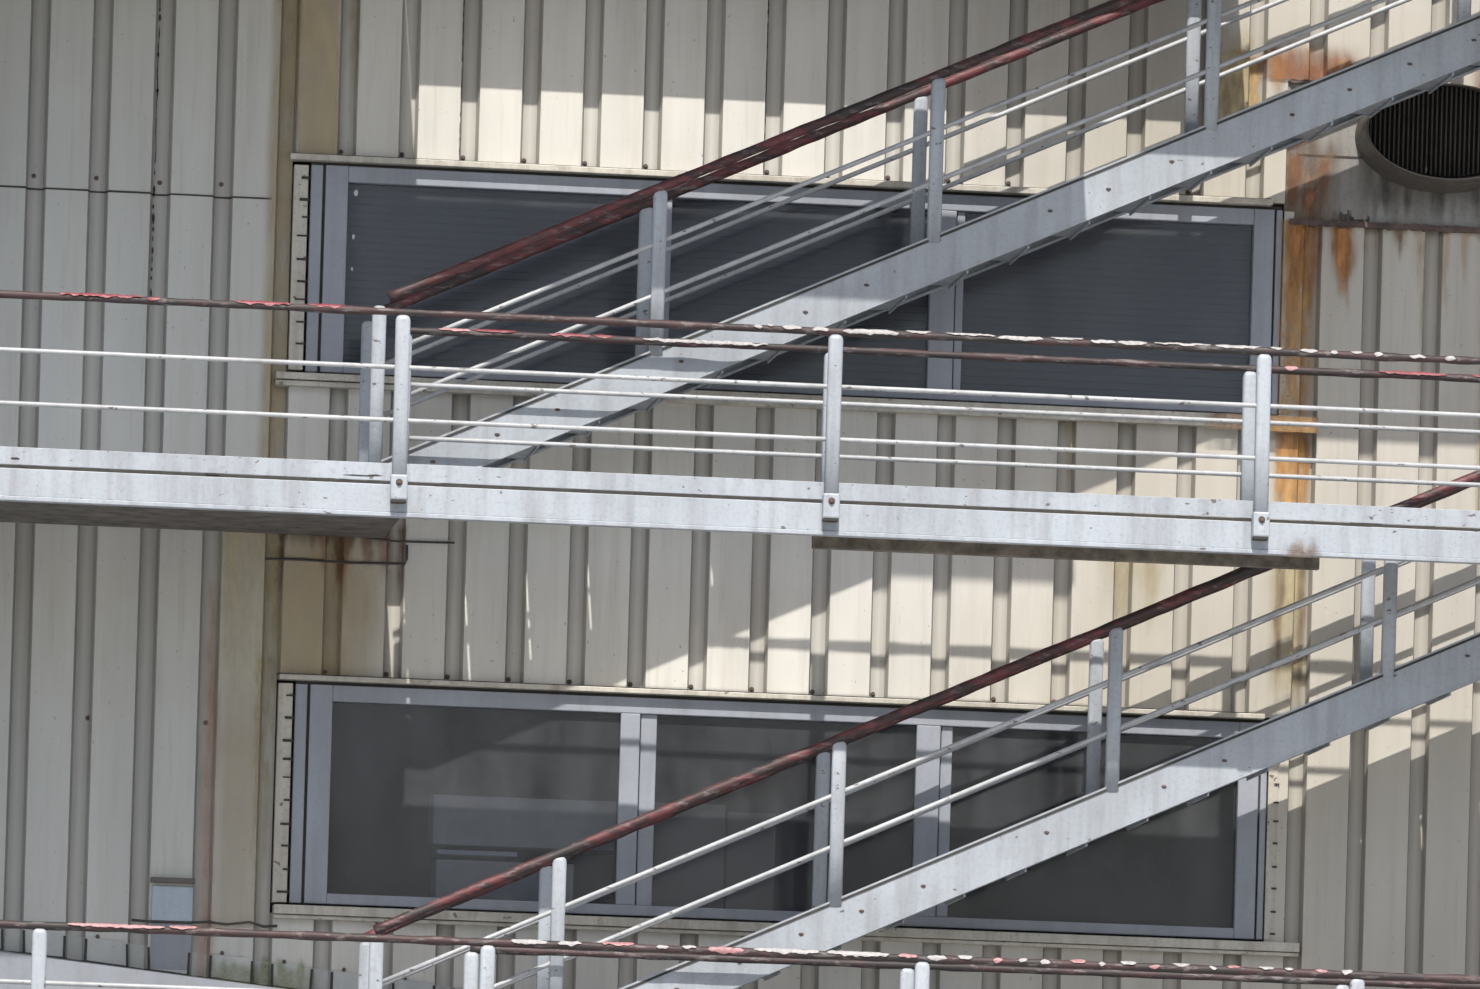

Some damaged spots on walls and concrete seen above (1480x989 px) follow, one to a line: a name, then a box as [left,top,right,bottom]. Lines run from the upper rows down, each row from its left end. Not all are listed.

corrosion [1269,50,1353,80]
corrosion [1270,141,1480,503]
corrosion [1214,413,1242,430]